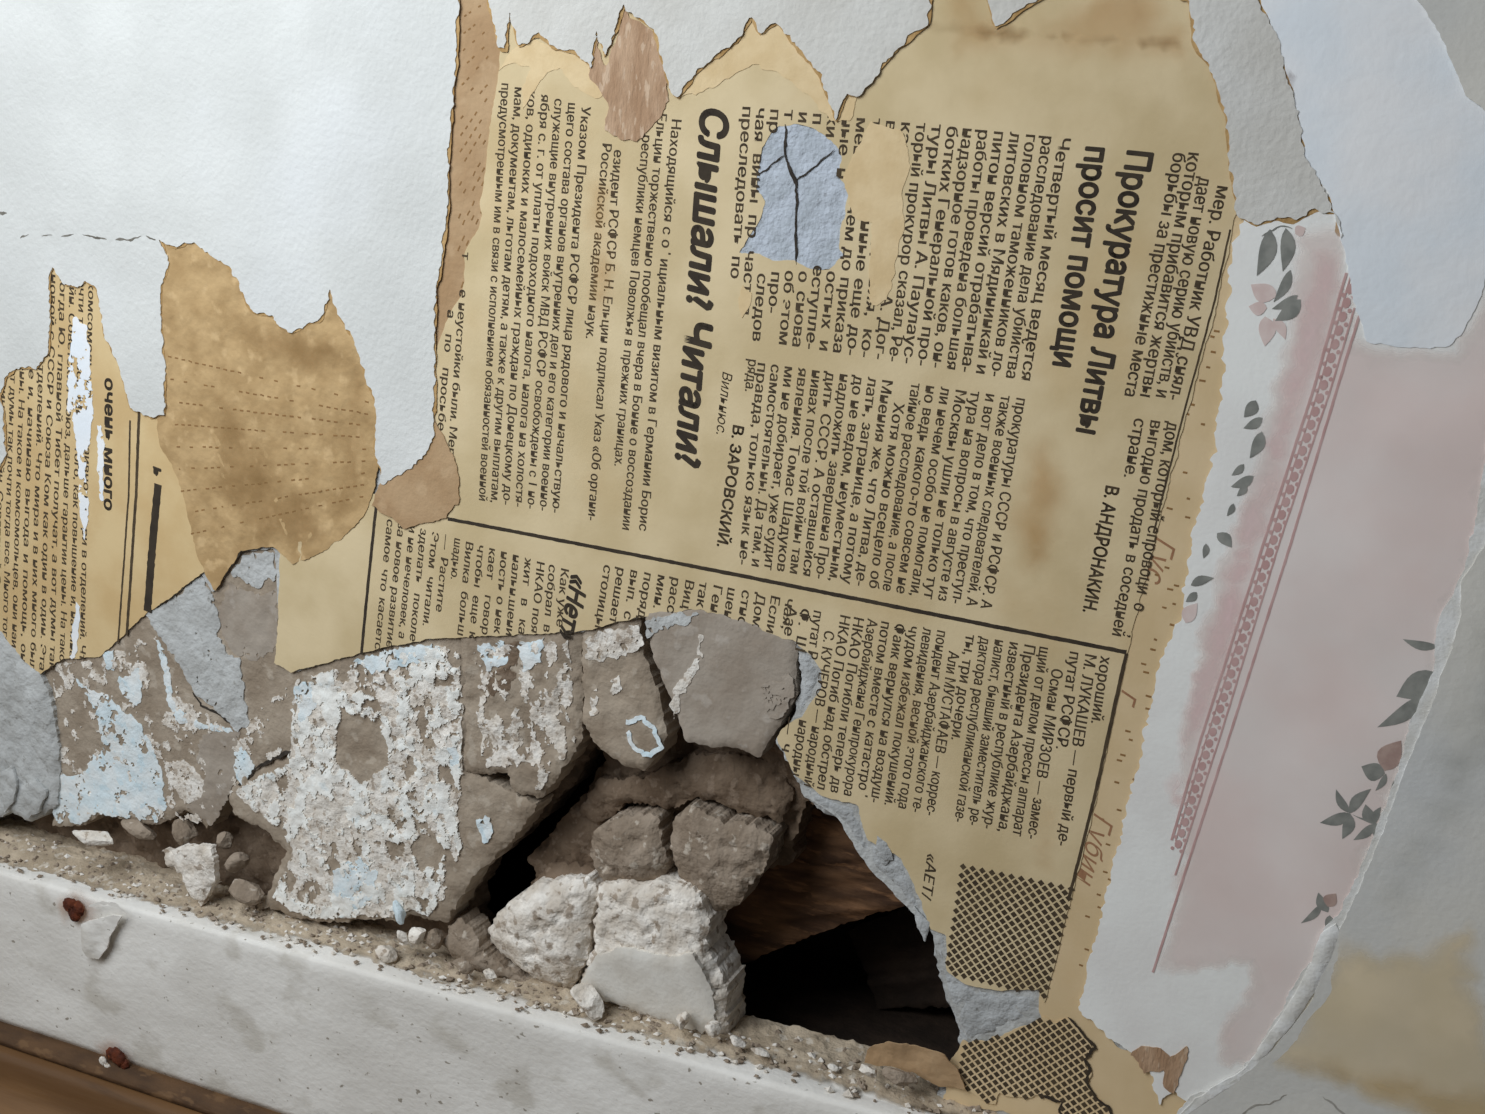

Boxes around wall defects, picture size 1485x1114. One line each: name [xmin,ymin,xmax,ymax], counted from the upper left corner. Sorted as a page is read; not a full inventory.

crack [0,211,156,242]
crack [758,125,834,265]
peeling [0,625,1034,1061]
damp [1281,937,1485,1114]